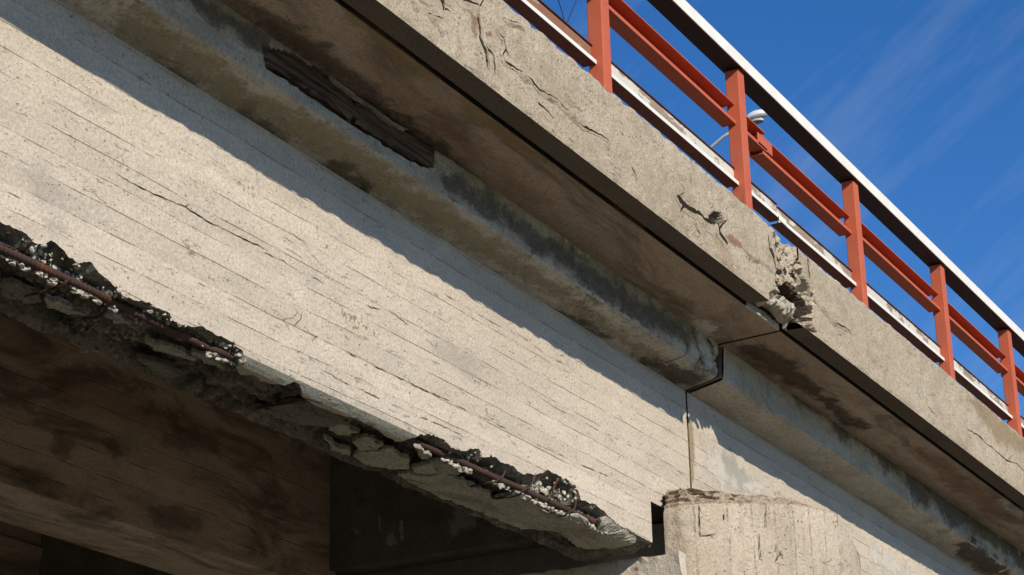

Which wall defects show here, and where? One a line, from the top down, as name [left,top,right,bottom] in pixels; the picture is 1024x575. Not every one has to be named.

crack [410,0,610,149]
crack [117,173,341,291]
crack [676,173,776,273]
spalling [745,229,817,335]
spalling [0,222,652,562]
damp [638,319,719,391]
damp [740,345,871,429]
damp [932,499,1019,575]